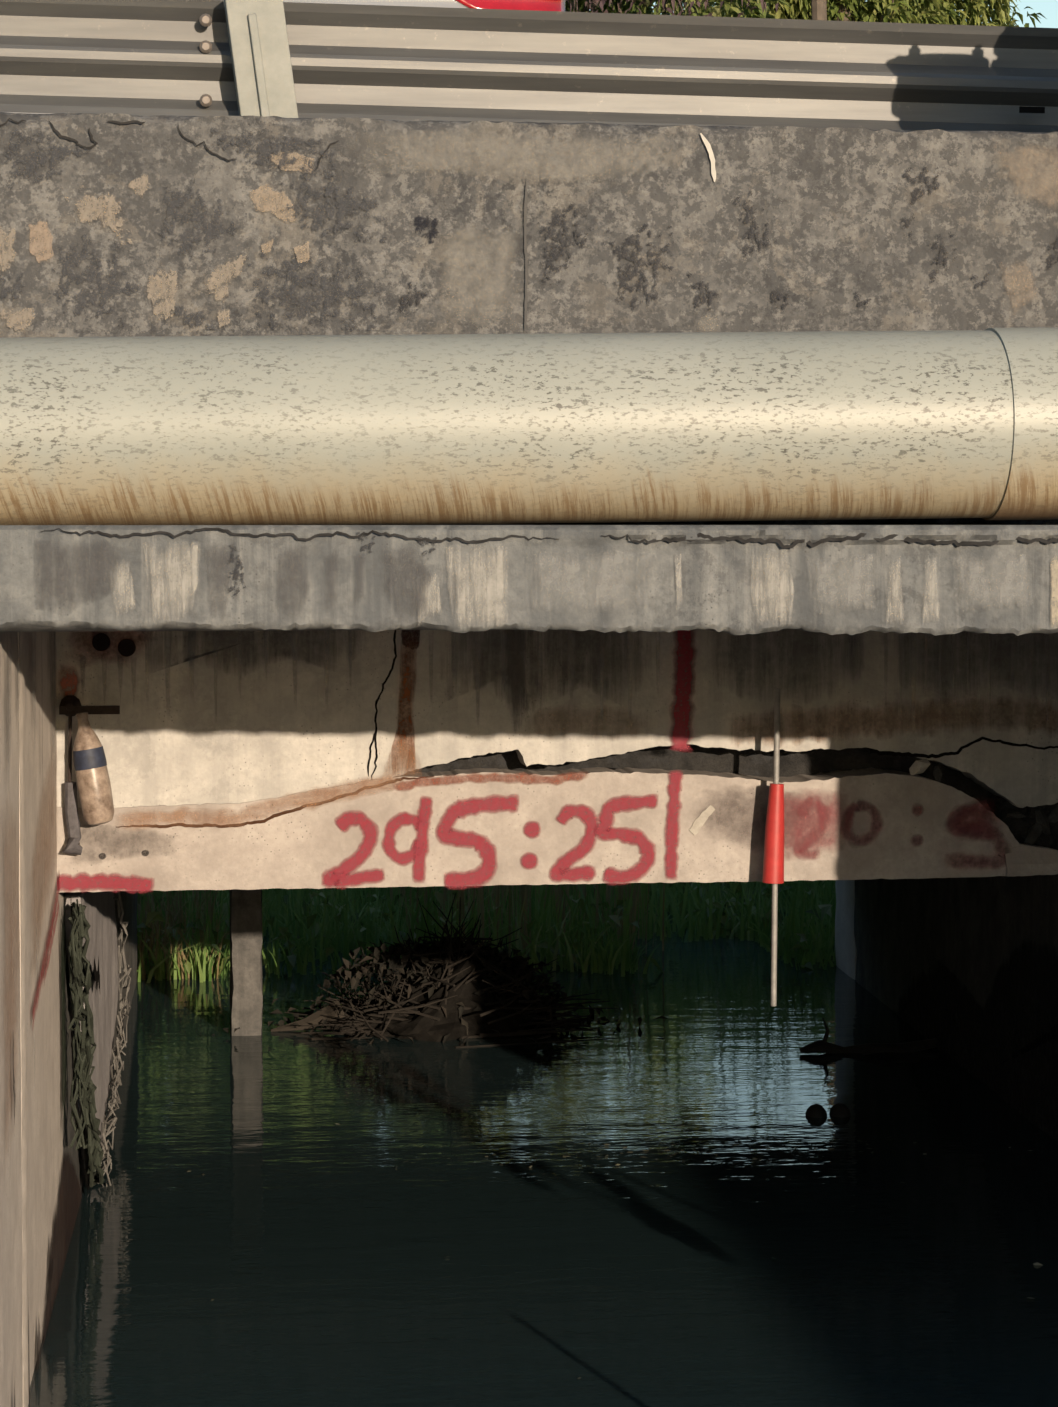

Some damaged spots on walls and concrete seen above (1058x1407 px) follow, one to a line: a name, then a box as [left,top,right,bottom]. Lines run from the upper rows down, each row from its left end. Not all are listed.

water stain [357,532,629,711]
water stain [539,552,645,609]
water stain [729,558,832,687]
water stain [817,555,871,606]
water stain [888,556,1058,696]
crack [117,630,434,828]
rust [294,644,585,807]
spalling [909,758,942,783]
crack [870,736,1058,759]
spalling [986,795,1058,850]